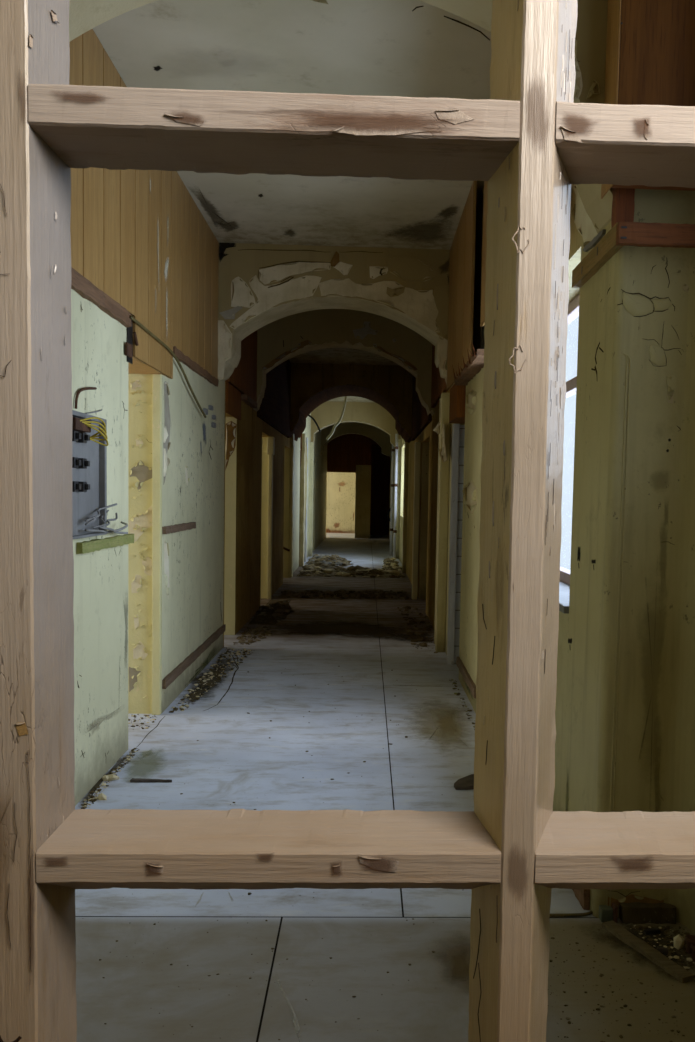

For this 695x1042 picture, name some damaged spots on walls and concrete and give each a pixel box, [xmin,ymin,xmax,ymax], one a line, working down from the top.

spalling [218,251,448,381]
crack [601,257,682,367]
peeling [130,380,171,499]
peeling [129,505,170,598]
peeling [129,604,152,698]